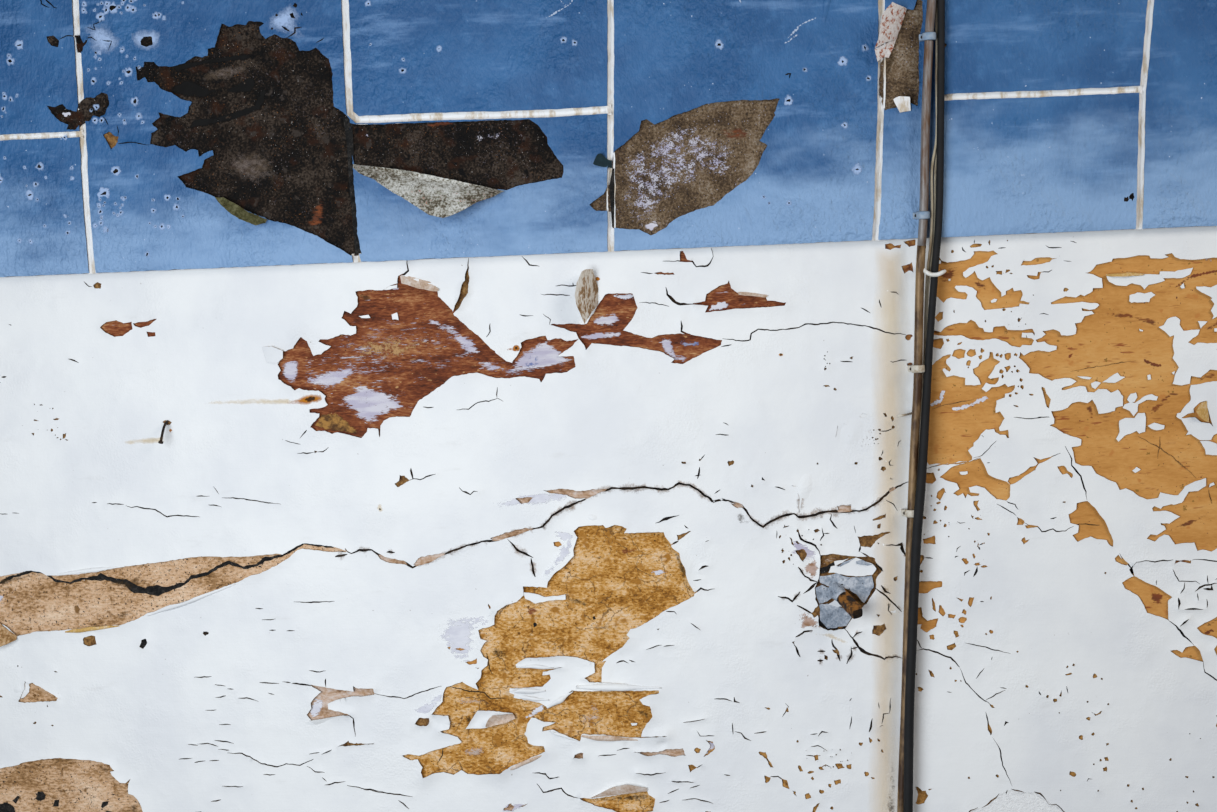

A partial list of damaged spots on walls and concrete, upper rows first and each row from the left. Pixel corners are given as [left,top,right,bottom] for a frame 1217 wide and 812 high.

peeling [875,0,923,113]
peeling [47,3,564,256]
peeling [590,99,779,235]
peeling [262,269,723,438]
peeling [918,240,1217,650]
peeling [0,543,348,647]
crack [257,601,332,631]
peeling [402,525,715,812]
crack [336,469,1071,812]
spalling [776,514,898,630]
peeling [0,758,143,812]
crack [181,670,408,812]